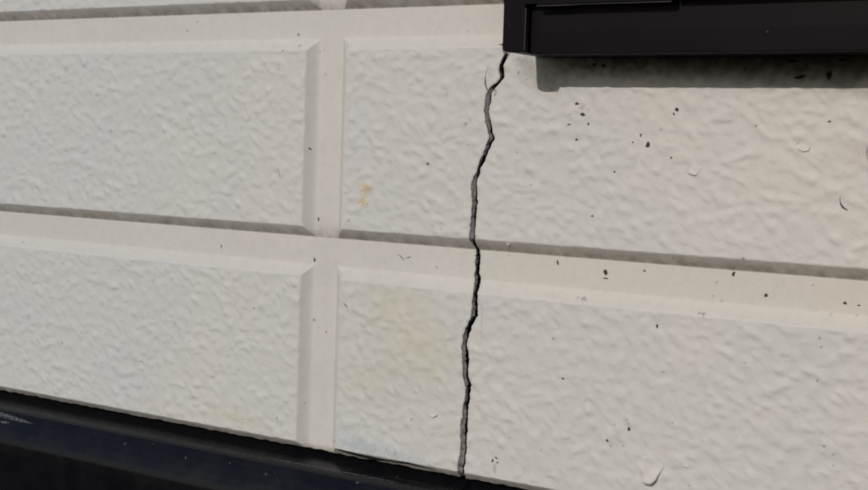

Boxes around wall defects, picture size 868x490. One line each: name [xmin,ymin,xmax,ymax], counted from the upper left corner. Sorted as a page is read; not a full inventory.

crack [457,43,510,475]